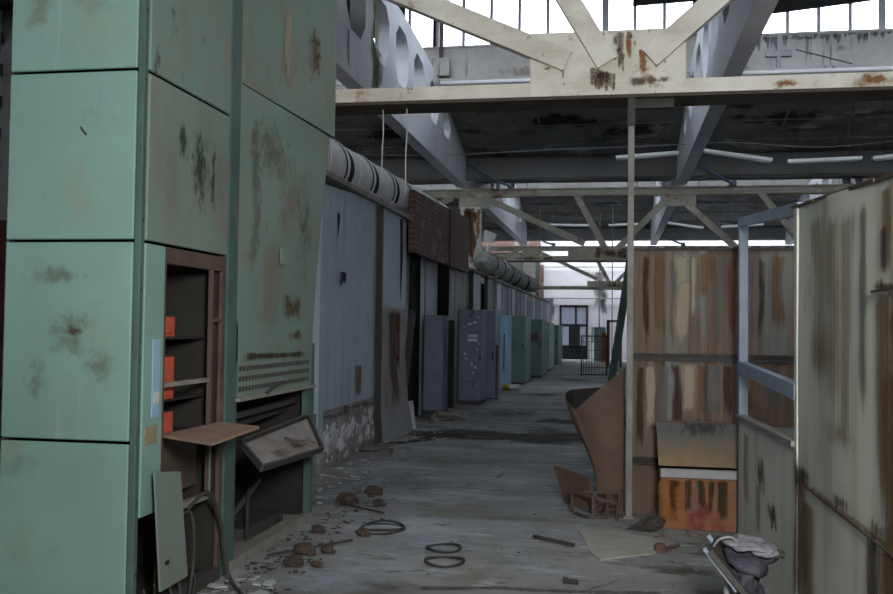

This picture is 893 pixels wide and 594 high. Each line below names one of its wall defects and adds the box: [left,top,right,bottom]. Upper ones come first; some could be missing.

corrosion [590,68,615,90]
corrosion [618,32,667,85]
corrosion [643,256,677,334]
corrosion [691,255,736,341]
corrosion [748,255,785,335]
flaking render [323,403,374,466]
corrosion [390,311,400,399]
corrosion [636,365,684,444]
corrosion [699,365,732,413]
corrosion [748,378,756,410]
corrosion [791,172,893,594]